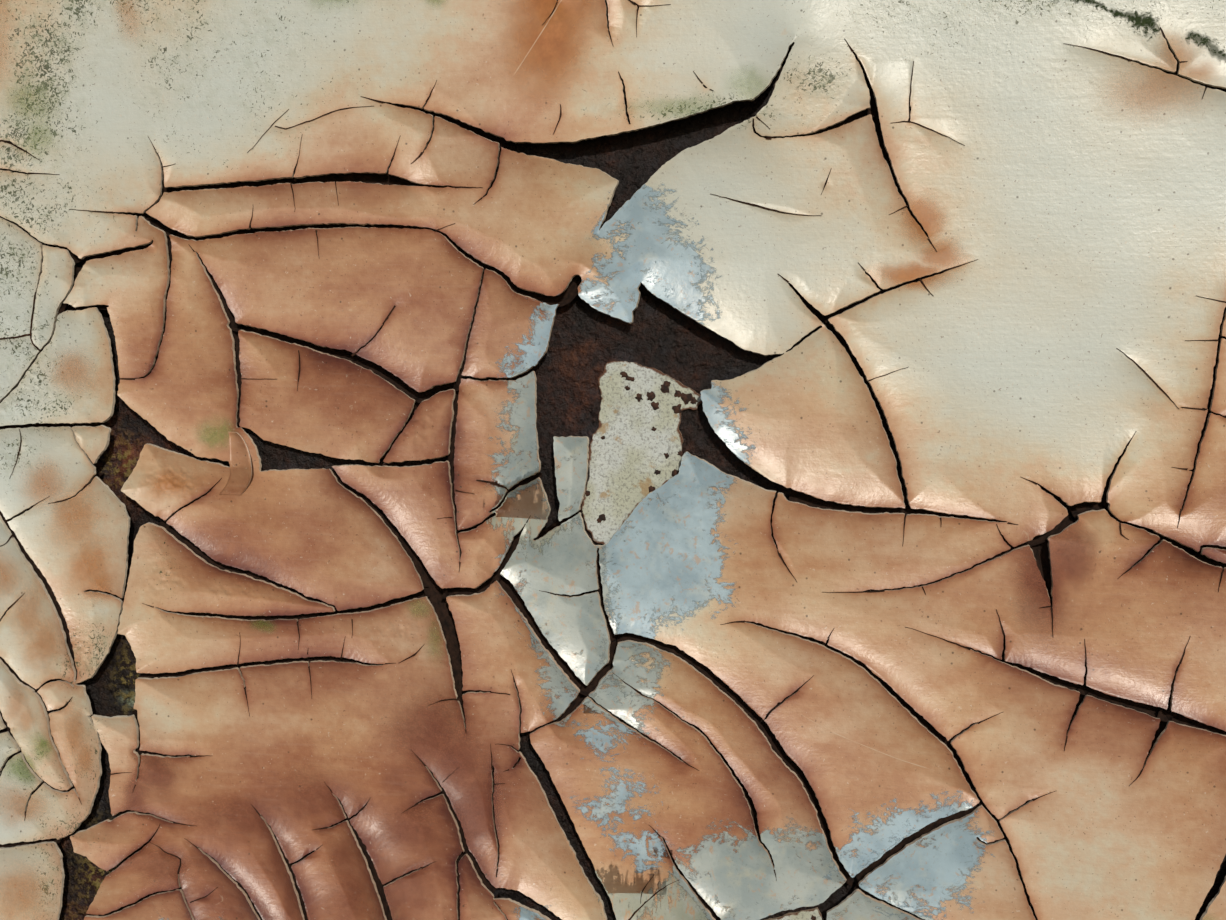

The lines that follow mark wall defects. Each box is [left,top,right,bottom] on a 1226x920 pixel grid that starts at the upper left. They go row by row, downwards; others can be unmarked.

crack [605,0,671,124]
water stain [1058,0,1160,39]
crack [1063,27,1226,99]
water stain [1186,32,1226,59]
crack [753,38,1226,633]
peeling [0,42,995,920]
crack [0,80,1055,920]
crack [906,609,1226,786]